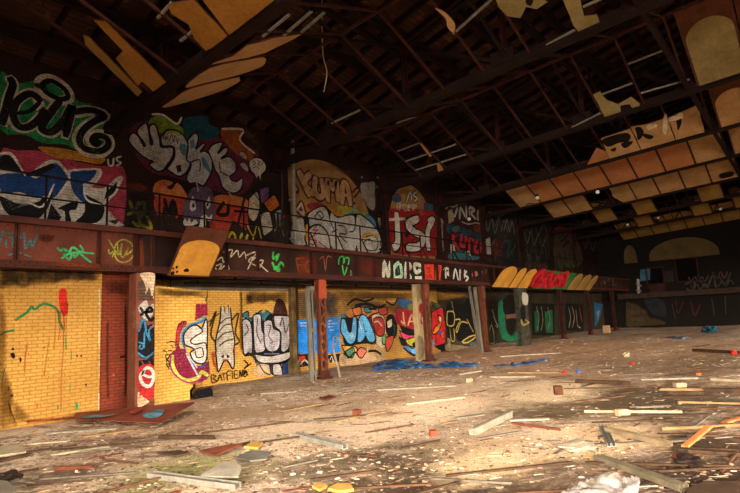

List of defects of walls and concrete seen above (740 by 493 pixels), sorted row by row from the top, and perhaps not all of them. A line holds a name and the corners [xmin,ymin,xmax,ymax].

peeling [601,112,683,152]